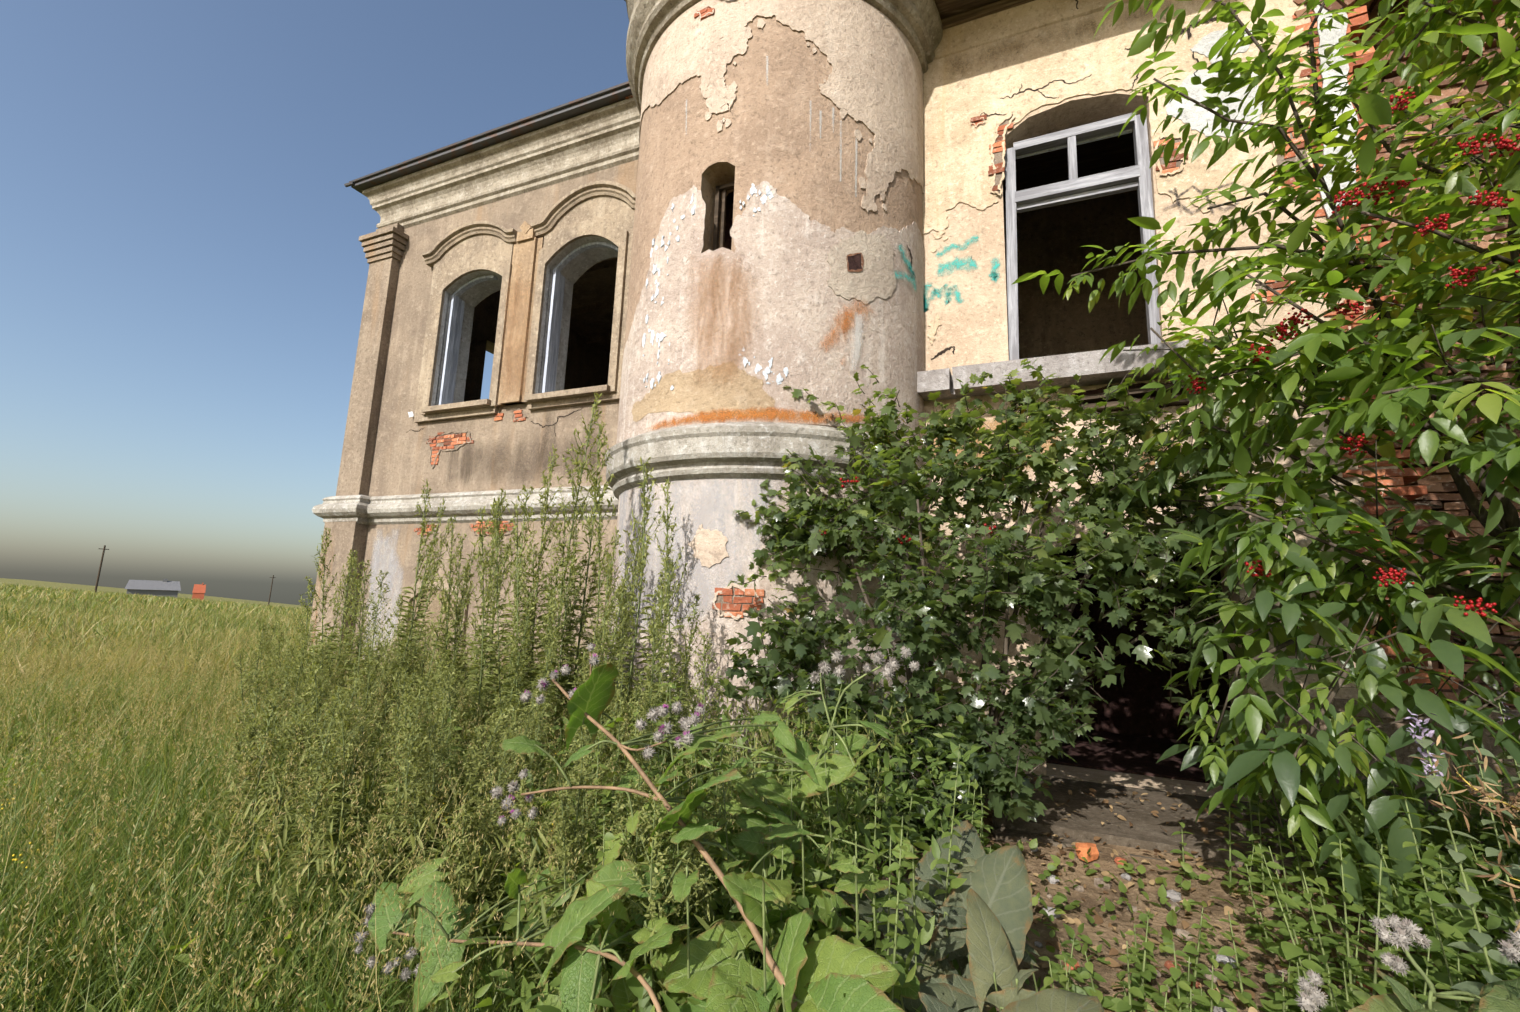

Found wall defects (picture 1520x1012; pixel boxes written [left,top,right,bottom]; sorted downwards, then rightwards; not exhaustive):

crack [980,74,1092,116]
flaking render [616,0,1316,449]
spalling [426,430,474,468]
flaking render [688,524,729,568]
spalling [712,583,764,620]